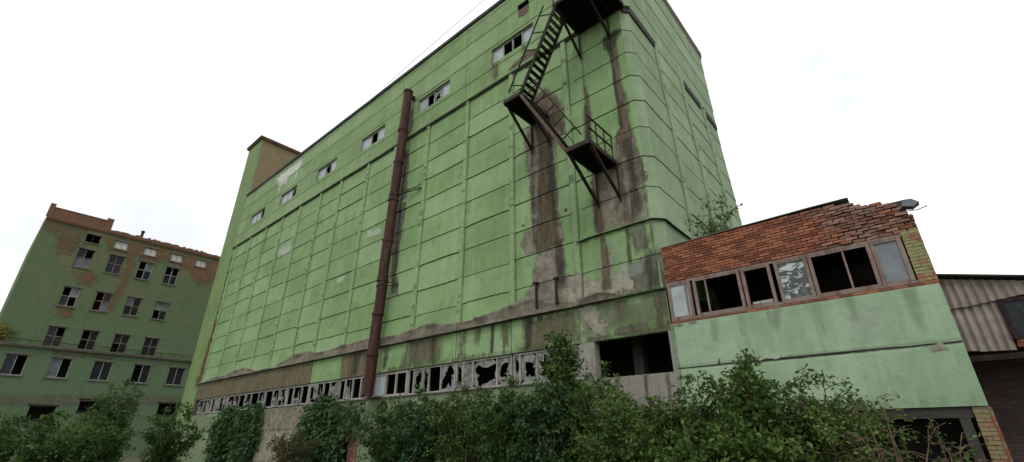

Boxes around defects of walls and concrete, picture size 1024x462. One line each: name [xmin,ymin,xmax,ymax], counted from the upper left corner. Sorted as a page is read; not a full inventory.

water stain [383,89,696,372]
flaking render [105,237,219,312]
peeling [578,305,647,337]